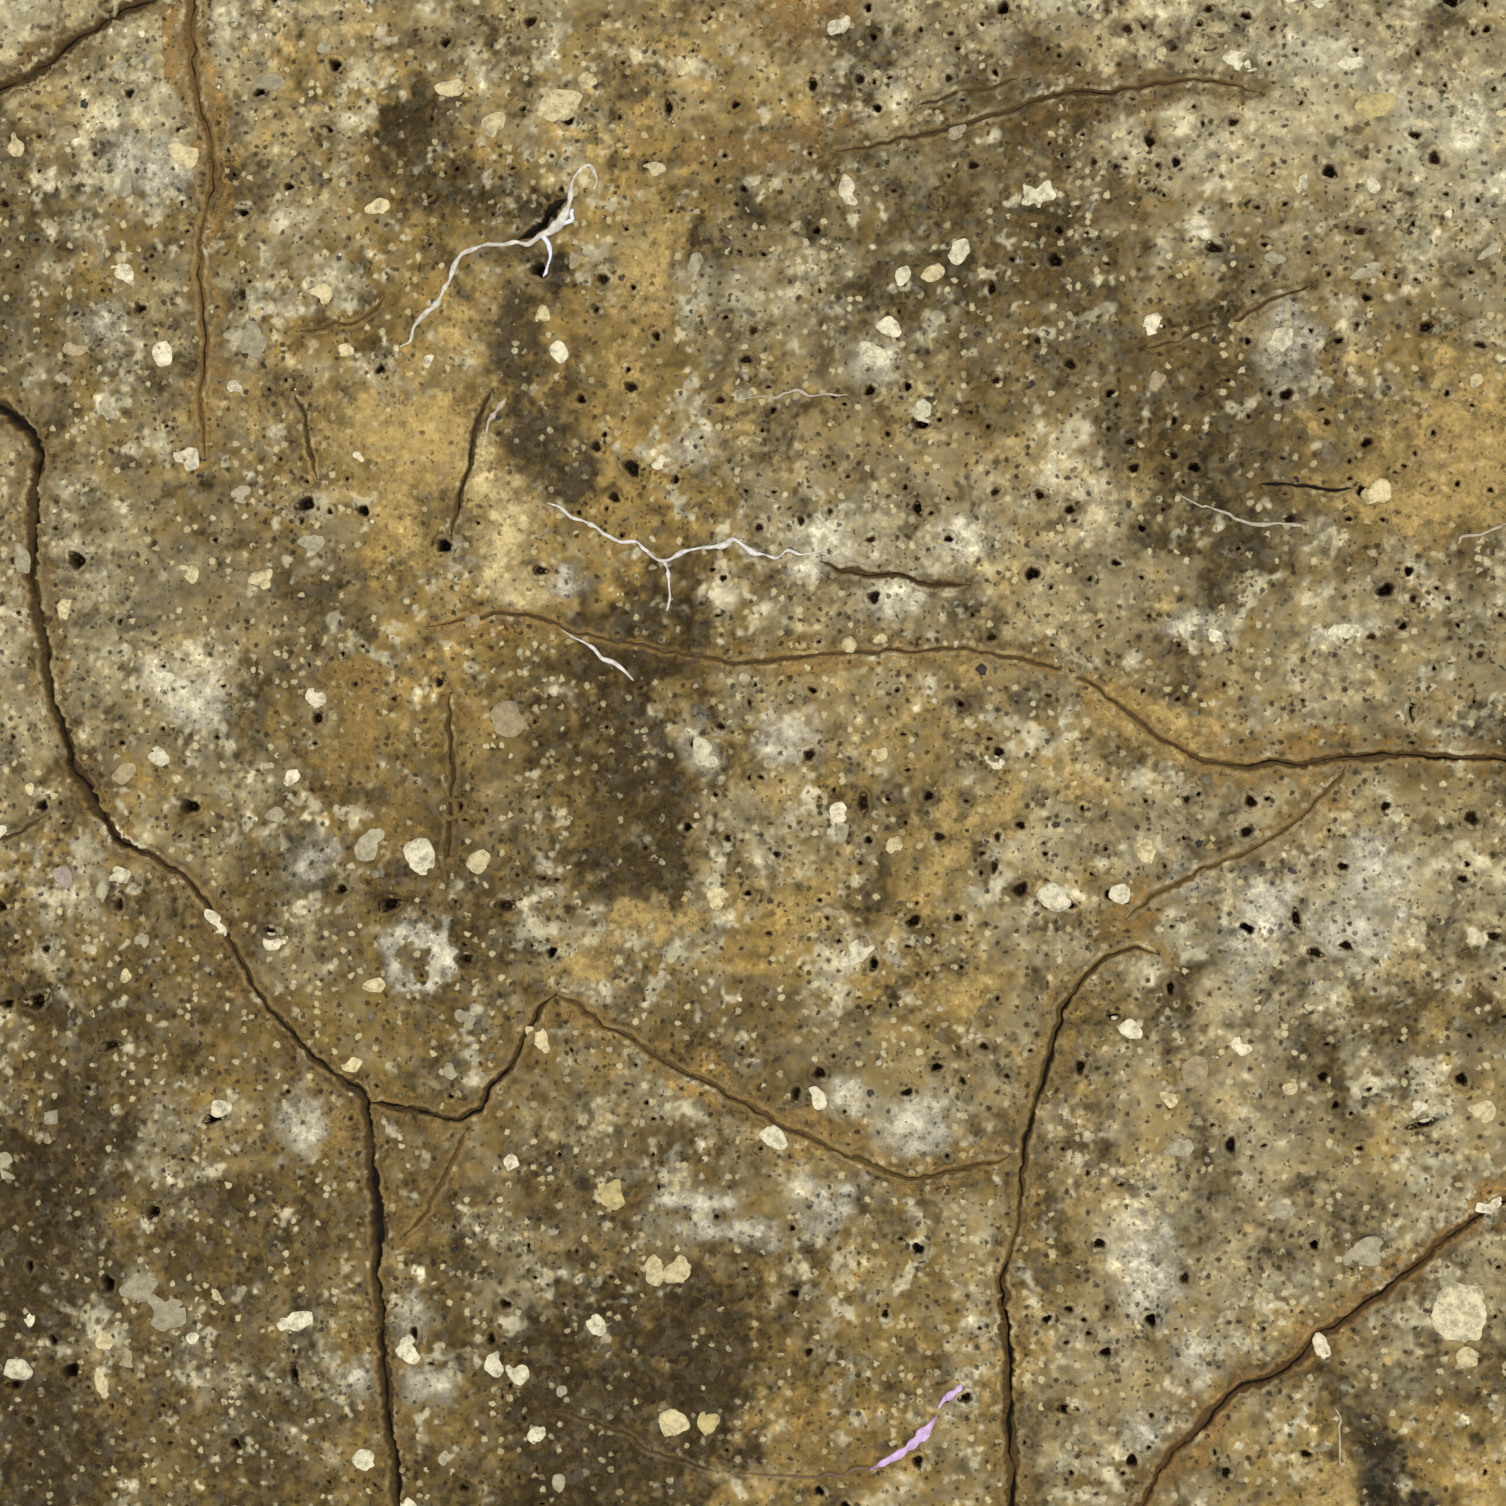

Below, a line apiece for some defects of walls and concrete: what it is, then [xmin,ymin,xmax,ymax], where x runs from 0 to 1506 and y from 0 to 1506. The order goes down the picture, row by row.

crack [0,0,241,472]
crack [276,286,391,487]
crack [508,193,568,250]
crack [0,384,1506,1506]